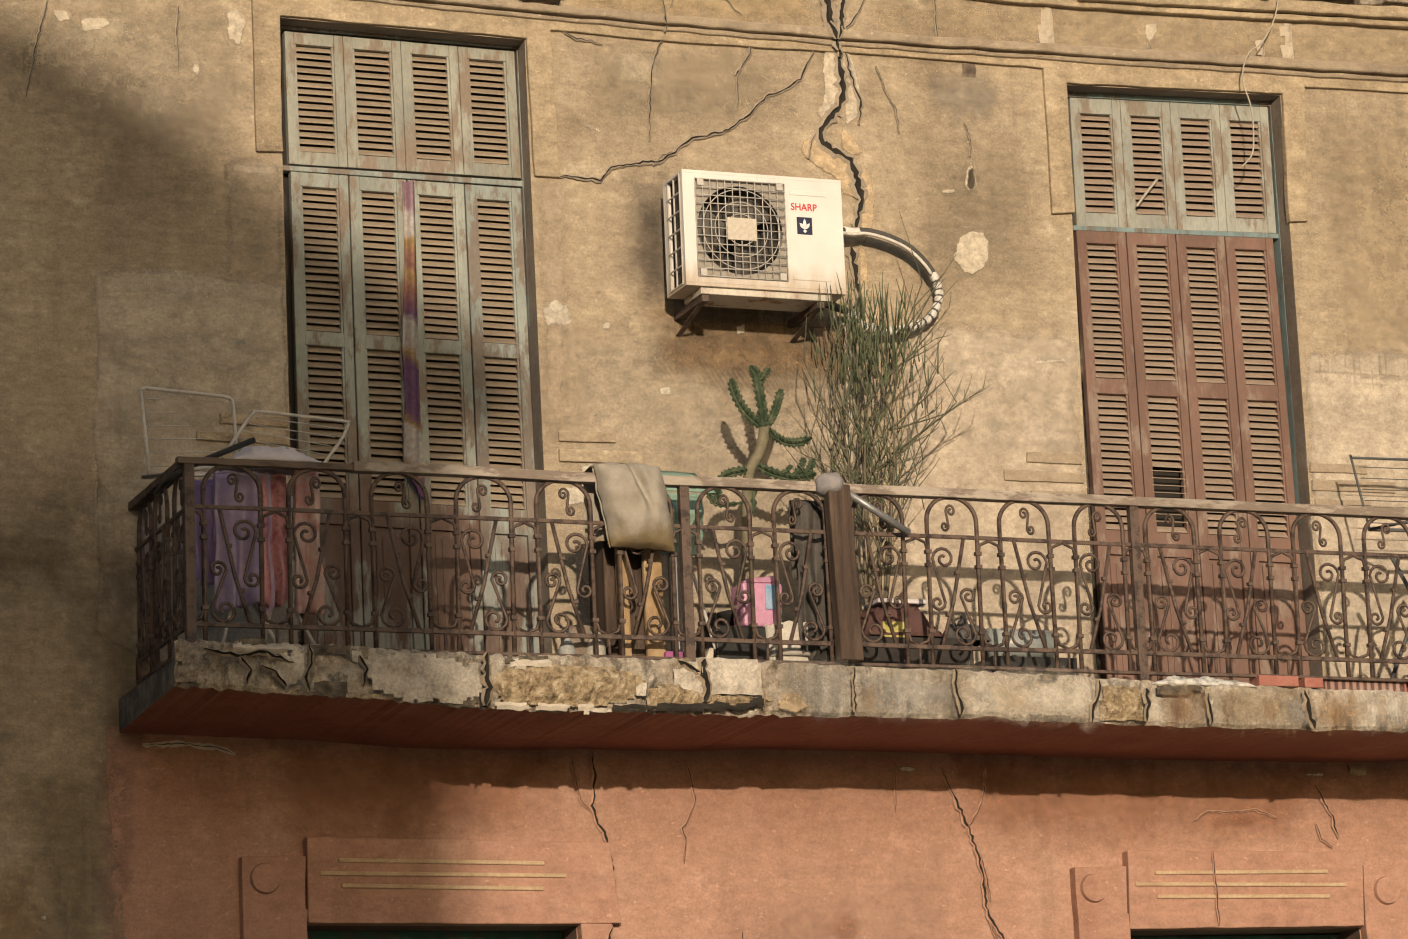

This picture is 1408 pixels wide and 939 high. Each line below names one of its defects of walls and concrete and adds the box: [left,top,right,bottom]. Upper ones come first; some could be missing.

crack [557,0,900,484]
peeling [953,231,989,274]
spalling [176,638,808,715]
crack [677,658,712,703]
crack [952,669,965,715]
spalling [1012,714,1071,722]
spalling [1099,684,1205,721]
crack [570,751,622,939]
crack [680,763,697,864]
crack [942,768,1005,939]